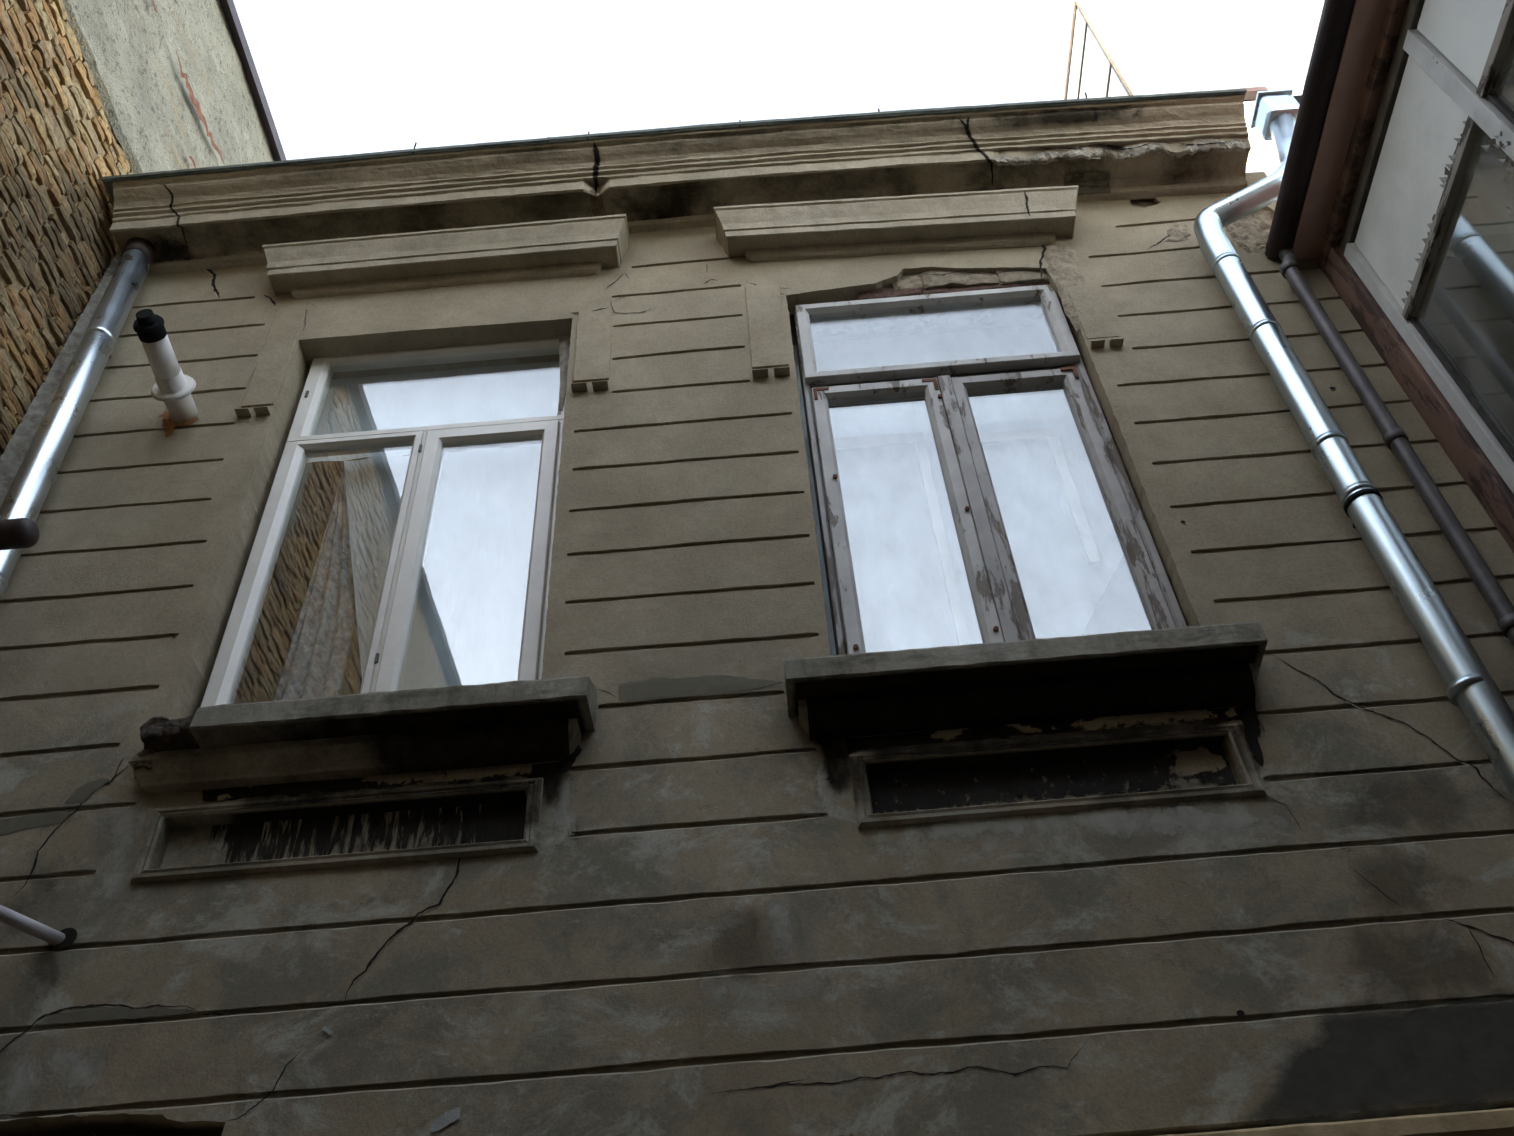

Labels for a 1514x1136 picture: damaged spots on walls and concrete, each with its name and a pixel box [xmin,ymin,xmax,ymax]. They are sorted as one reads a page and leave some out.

crack [155,51,225,299]
crack [592,143,601,194]
crack [959,117,1047,281]
spalling [994,138,1247,166]
spalling [858,240,1088,332]
crack [1272,655,1514,805]
crack [11,757,127,900]
crack [344,841,468,1006]
crack [0,1004,239,1054]
crack [222,1052,300,1122]
crack [711,1043,1086,1094]